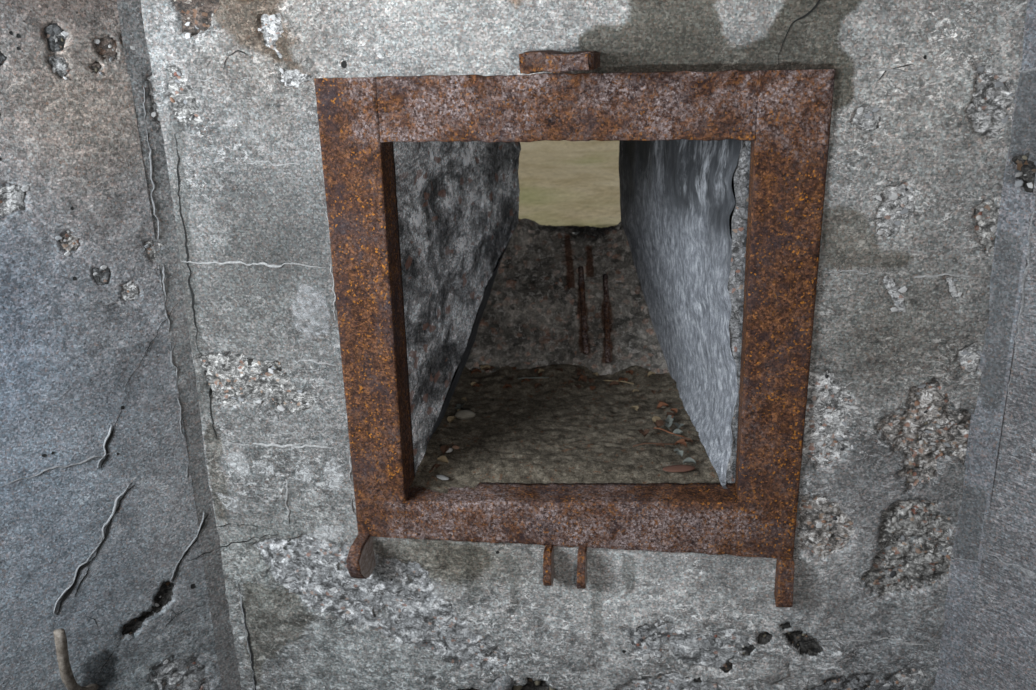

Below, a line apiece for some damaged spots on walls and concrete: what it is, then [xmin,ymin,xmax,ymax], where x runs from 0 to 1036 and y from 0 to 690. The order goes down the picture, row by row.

crack [54,482,134,626]
crack [170,512,281,581]
hole [122,581,174,635]
peeling [253,533,558,690]
peeling [615,619,823,690]